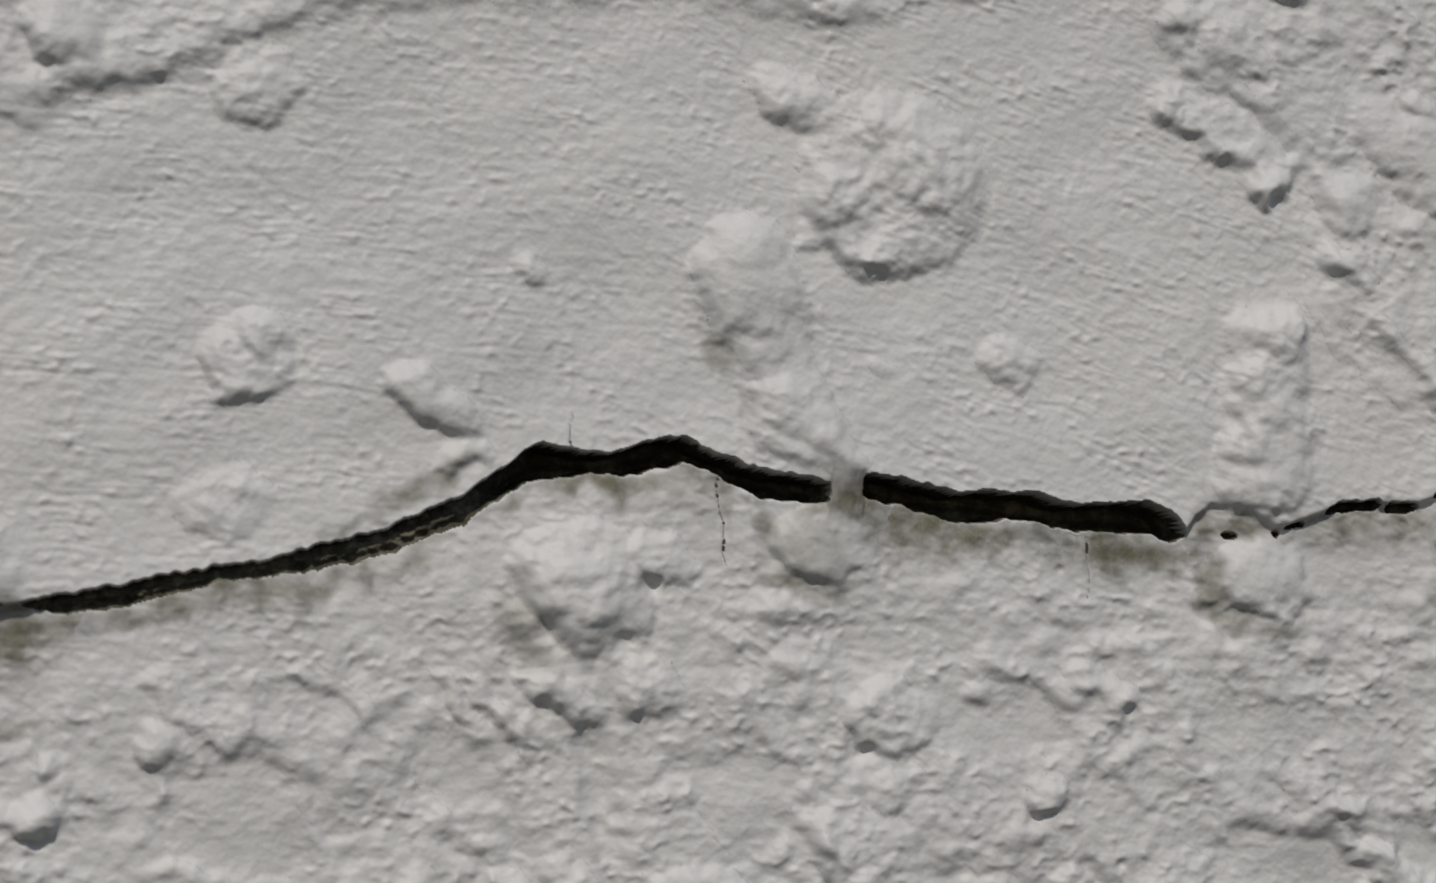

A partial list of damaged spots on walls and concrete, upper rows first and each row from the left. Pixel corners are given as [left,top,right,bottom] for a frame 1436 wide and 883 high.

crack [0,438,1185,616]
crack [1220,493,1436,540]